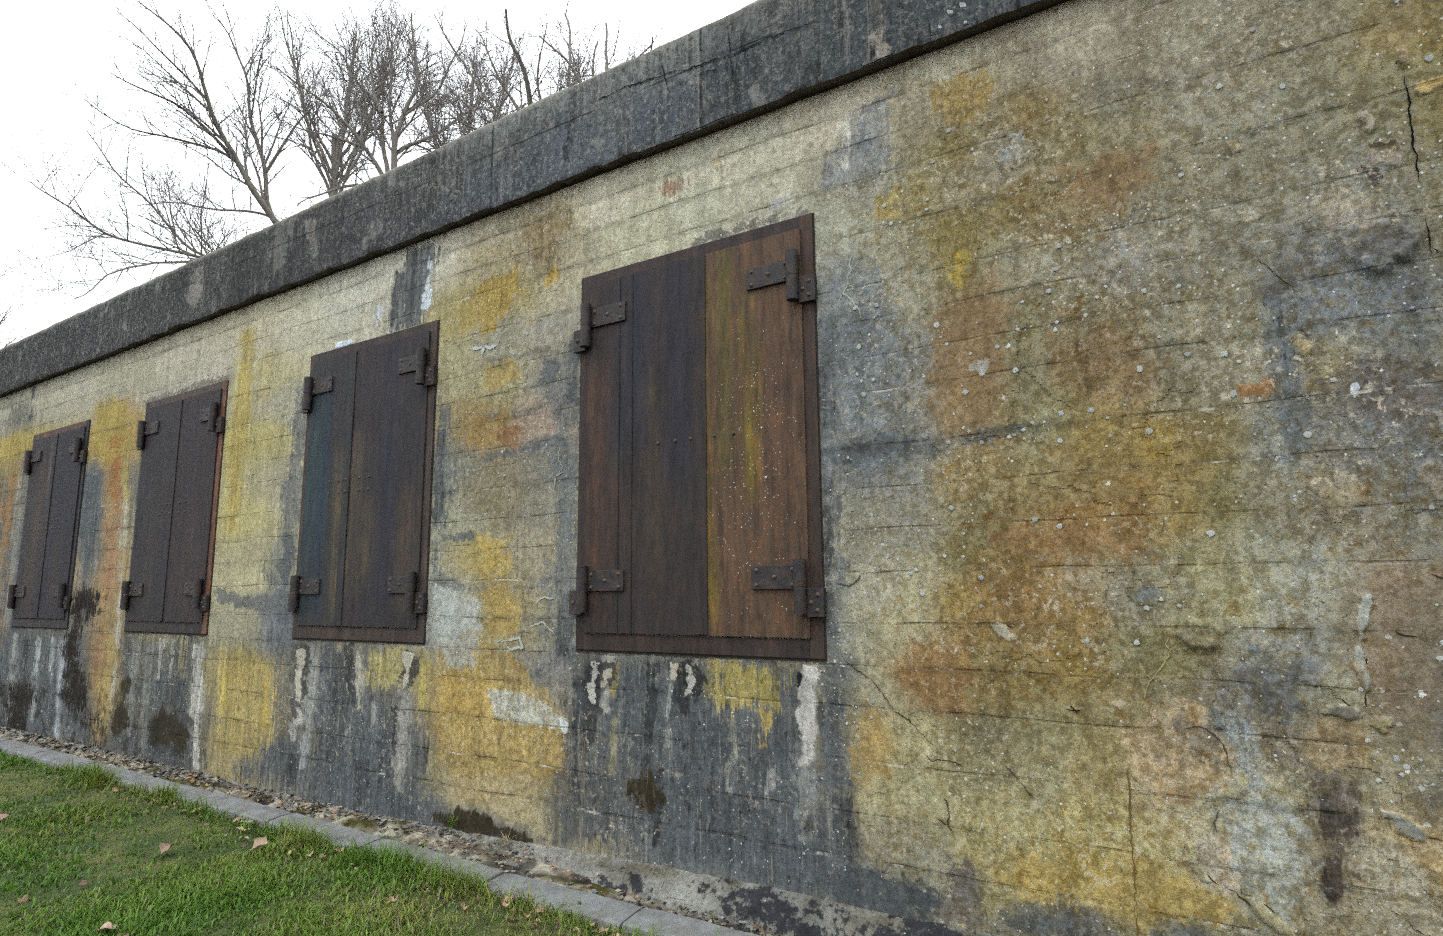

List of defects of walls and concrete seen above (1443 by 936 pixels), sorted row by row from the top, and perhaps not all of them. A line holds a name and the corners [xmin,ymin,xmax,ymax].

crack [1404,71,1438,254]
leakage [0,384,50,585]
leakage [6,456,98,746]
leakage [112,0,1259,936]
leakage [1212,641,1379,918]